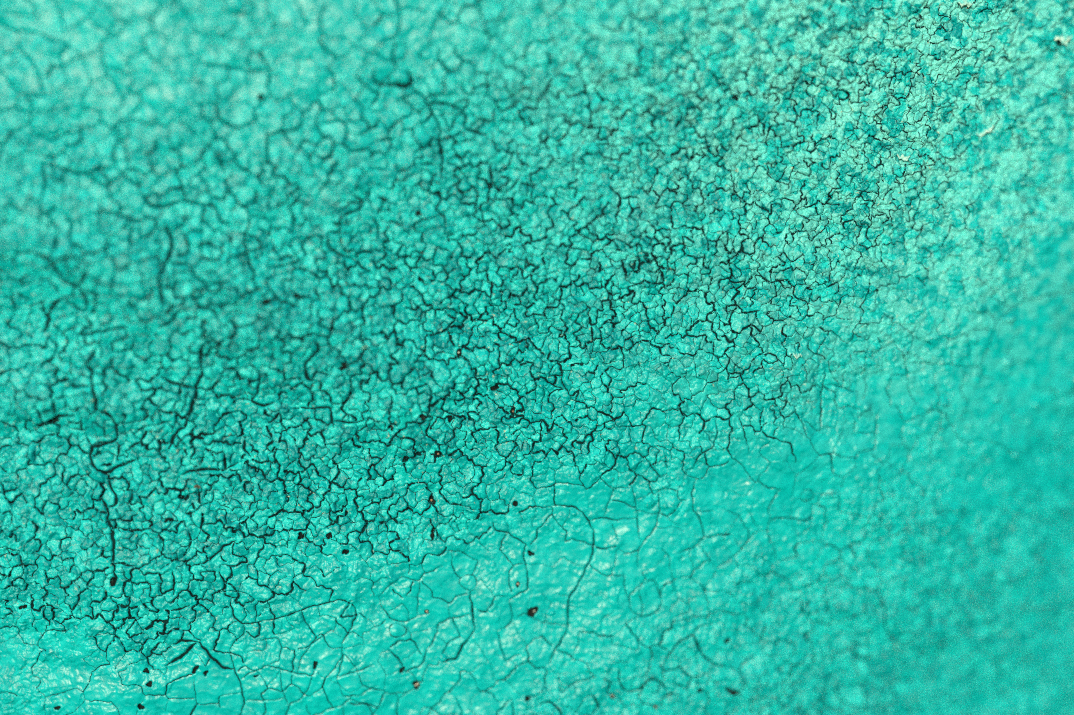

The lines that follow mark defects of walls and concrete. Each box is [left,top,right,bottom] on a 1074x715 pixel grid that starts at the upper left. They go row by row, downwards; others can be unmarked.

crack [972,150,1008,198]
crack [1003,80,1074,241]
crack [886,373,1074,577]
crack [118,660,221,715]